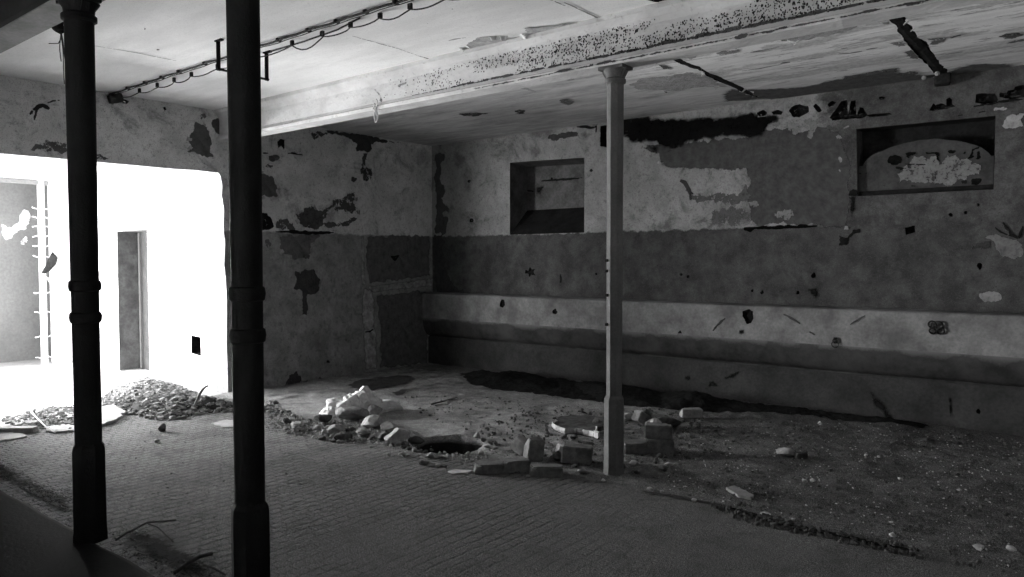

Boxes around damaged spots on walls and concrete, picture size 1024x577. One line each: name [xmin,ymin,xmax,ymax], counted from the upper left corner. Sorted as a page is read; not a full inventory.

peeling [780,26,857,45]
spalling [880,17,946,73]
peeling [975,85,1024,129]
peeling [31,140,67,154]
peeling [186,113,219,157]
peeling [642,100,891,230]
peeling [262,192,360,319]